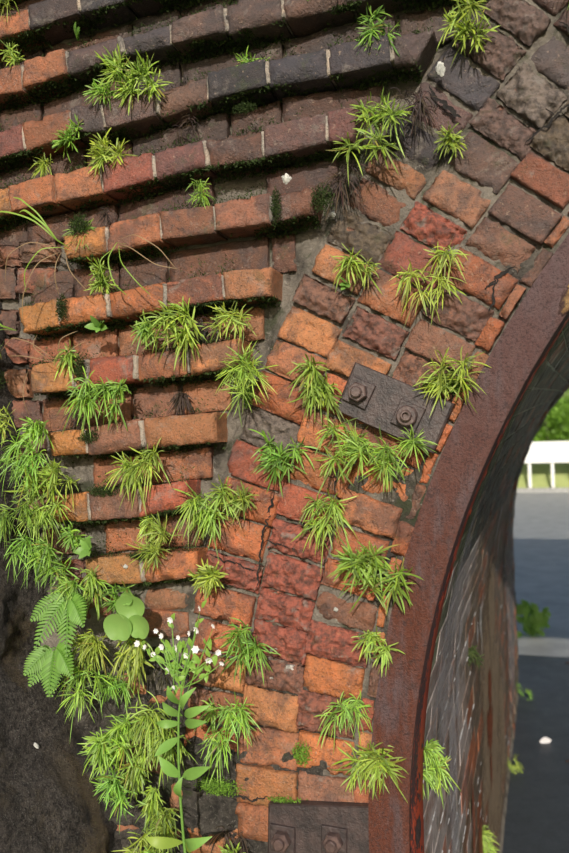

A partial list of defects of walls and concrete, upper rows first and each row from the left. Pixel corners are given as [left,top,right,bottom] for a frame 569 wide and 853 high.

crack [485,266,515,311]
peeling [521,284,569,400]
crack [207,492,295,589]